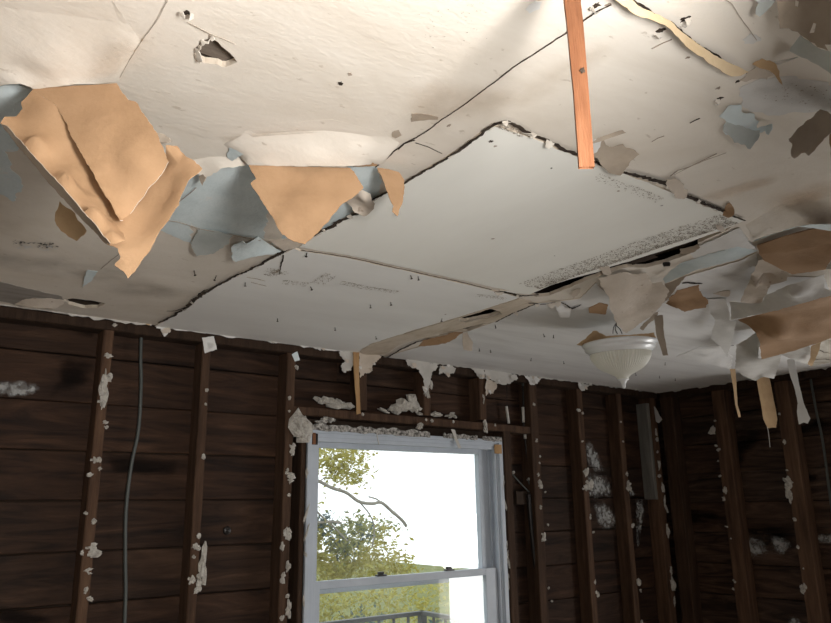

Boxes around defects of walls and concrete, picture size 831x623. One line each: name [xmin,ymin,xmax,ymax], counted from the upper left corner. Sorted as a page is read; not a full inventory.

crack [120,0,168,77]
crack [634,0,722,59]
peeling [735,59,831,116]
peeling [0,90,32,202]
peeling [160,164,287,245]
peeling [322,202,354,229]
peeling [347,166,382,199]
crack [158,4,611,323]
crack [623,153,746,221]
spalling [360,298,534,355]